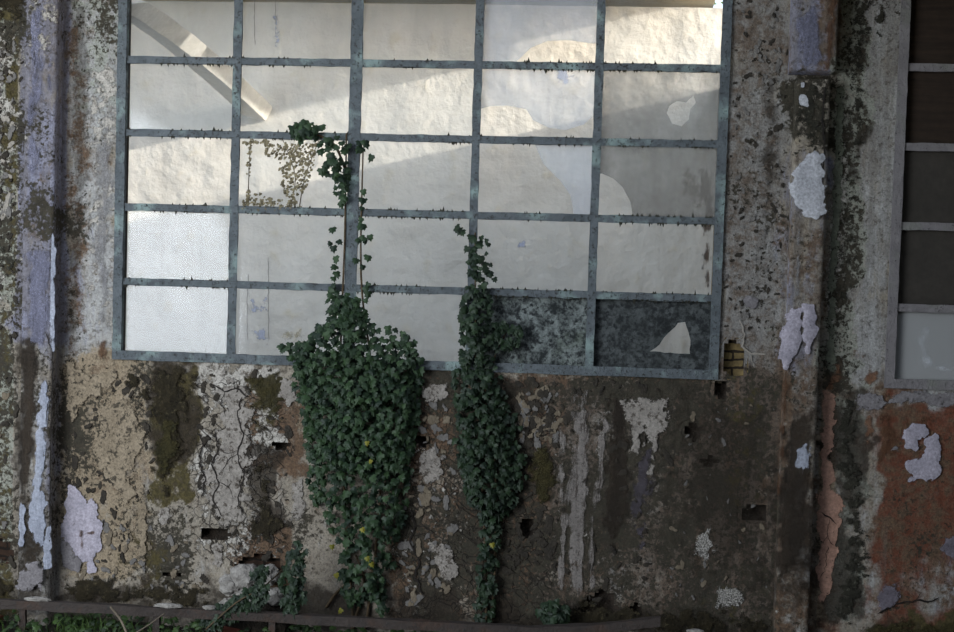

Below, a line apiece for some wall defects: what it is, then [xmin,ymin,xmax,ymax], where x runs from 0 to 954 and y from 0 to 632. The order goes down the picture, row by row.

flaking render [788,151,827,220]
flaking render [59,361,298,590]
crack [195,384,253,517]
flaking render [397,383,459,607]
leakage [500,377,674,605]
flaking render [619,334,753,476]
flaking render [778,303,819,370]
flaking render [815,390,845,602]
peeling [855,389,954,411]
peeling [891,423,941,482]